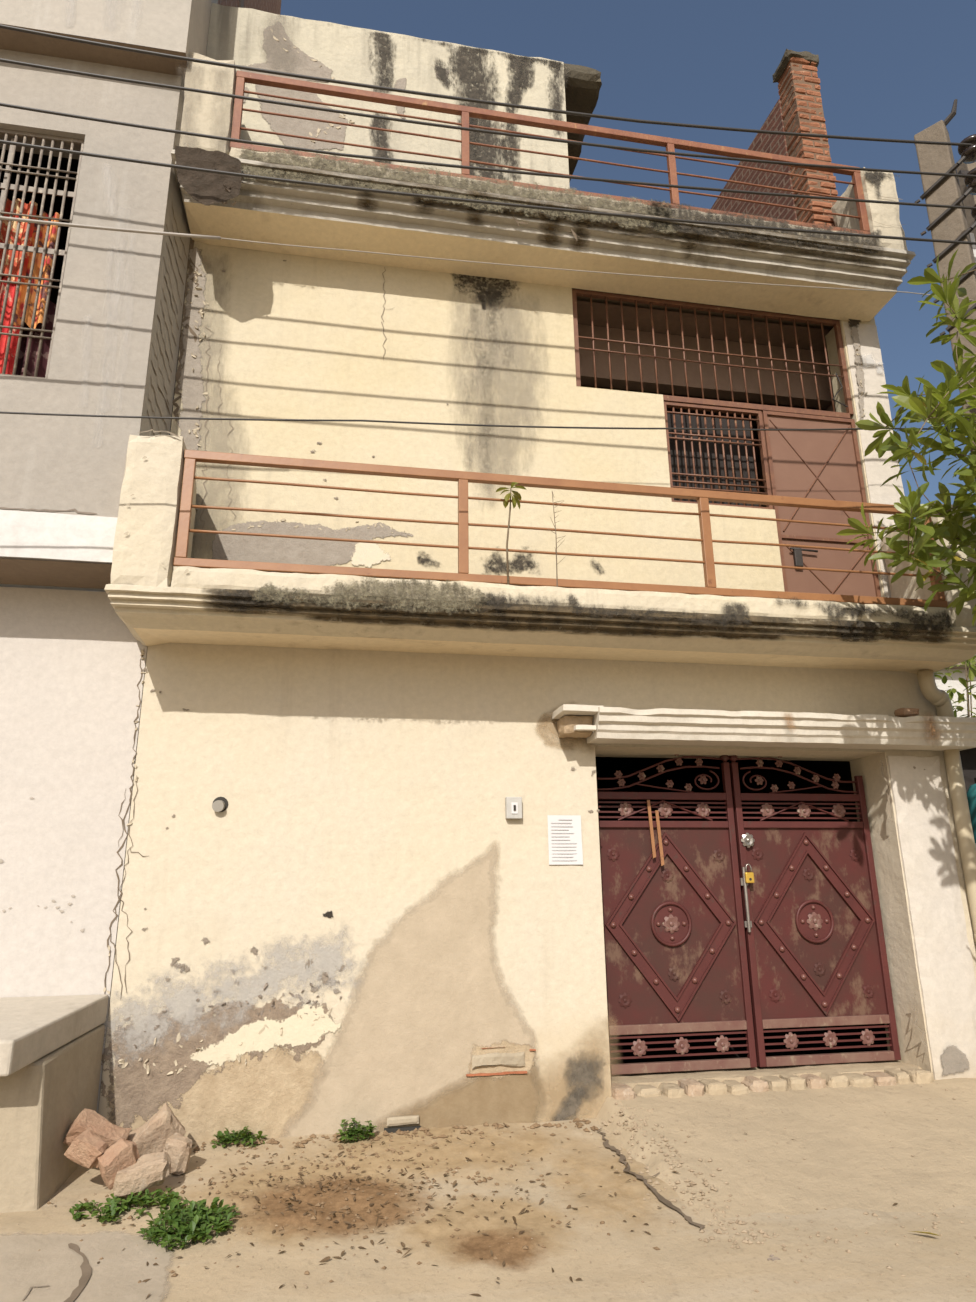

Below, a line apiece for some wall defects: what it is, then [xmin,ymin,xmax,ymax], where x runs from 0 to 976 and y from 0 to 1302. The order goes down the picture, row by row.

peeling [241,21,355,151]
damp [370,32,394,93]
spalling [175,146,242,206]
damp [262,162,352,184]
damp [359,42,883,265]
damp [453,273,517,305]
peeling [212,519,413,568]
damp [206,589,954,643]
crack [103,649,145,1000]
peeling [101,933,353,1142]